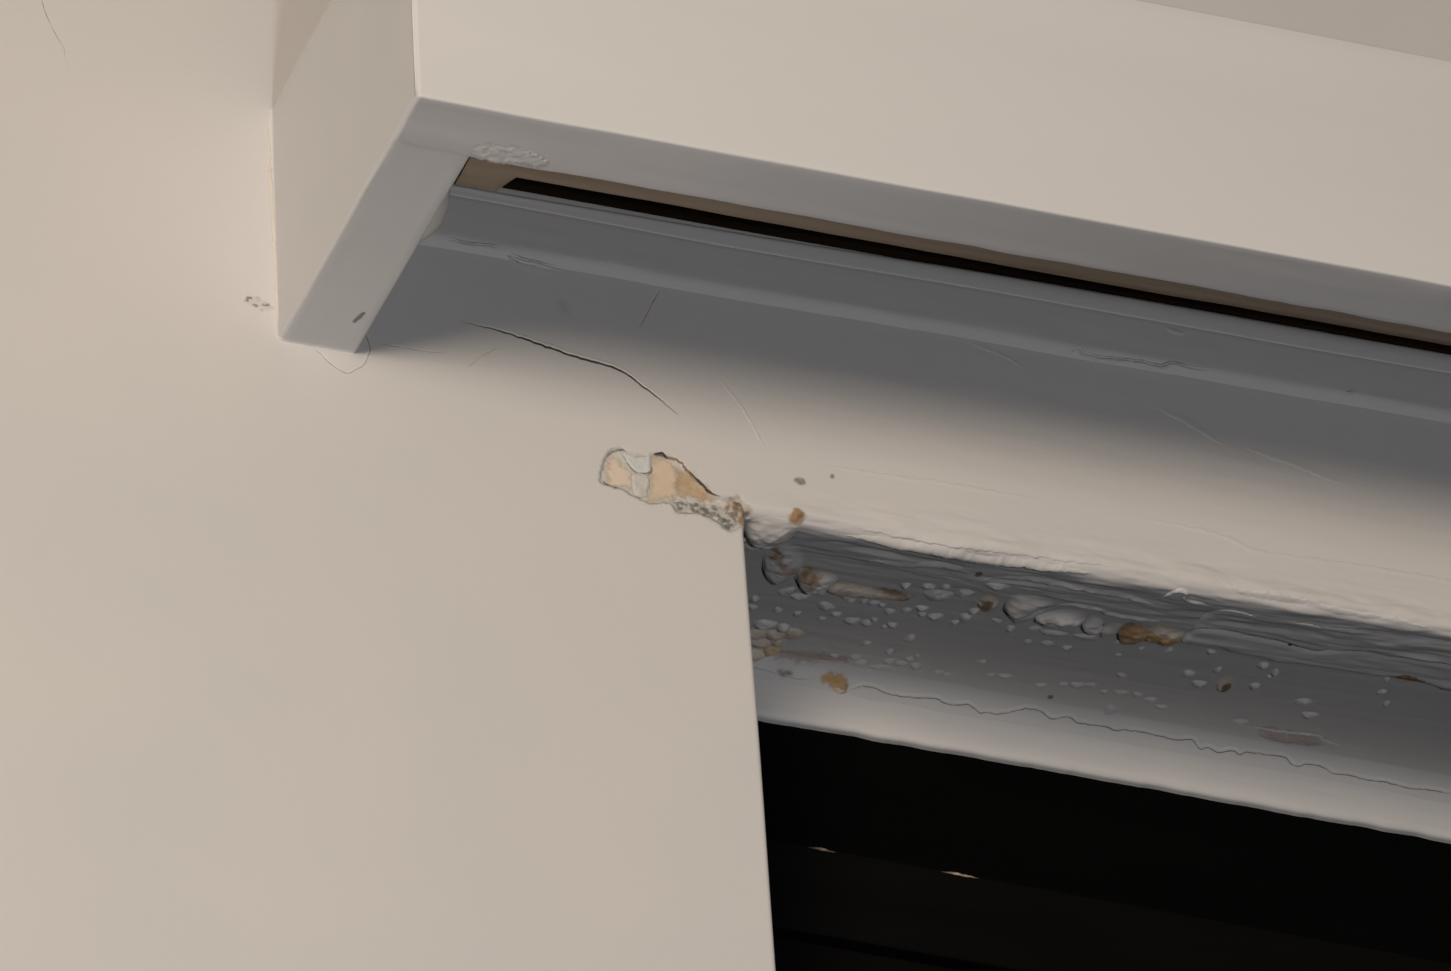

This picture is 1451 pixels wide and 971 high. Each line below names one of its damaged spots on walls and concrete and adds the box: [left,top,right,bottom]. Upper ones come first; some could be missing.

crack [464,321,677,414]
peeling [599,448,751,531]
crack [849,682,1451,793]